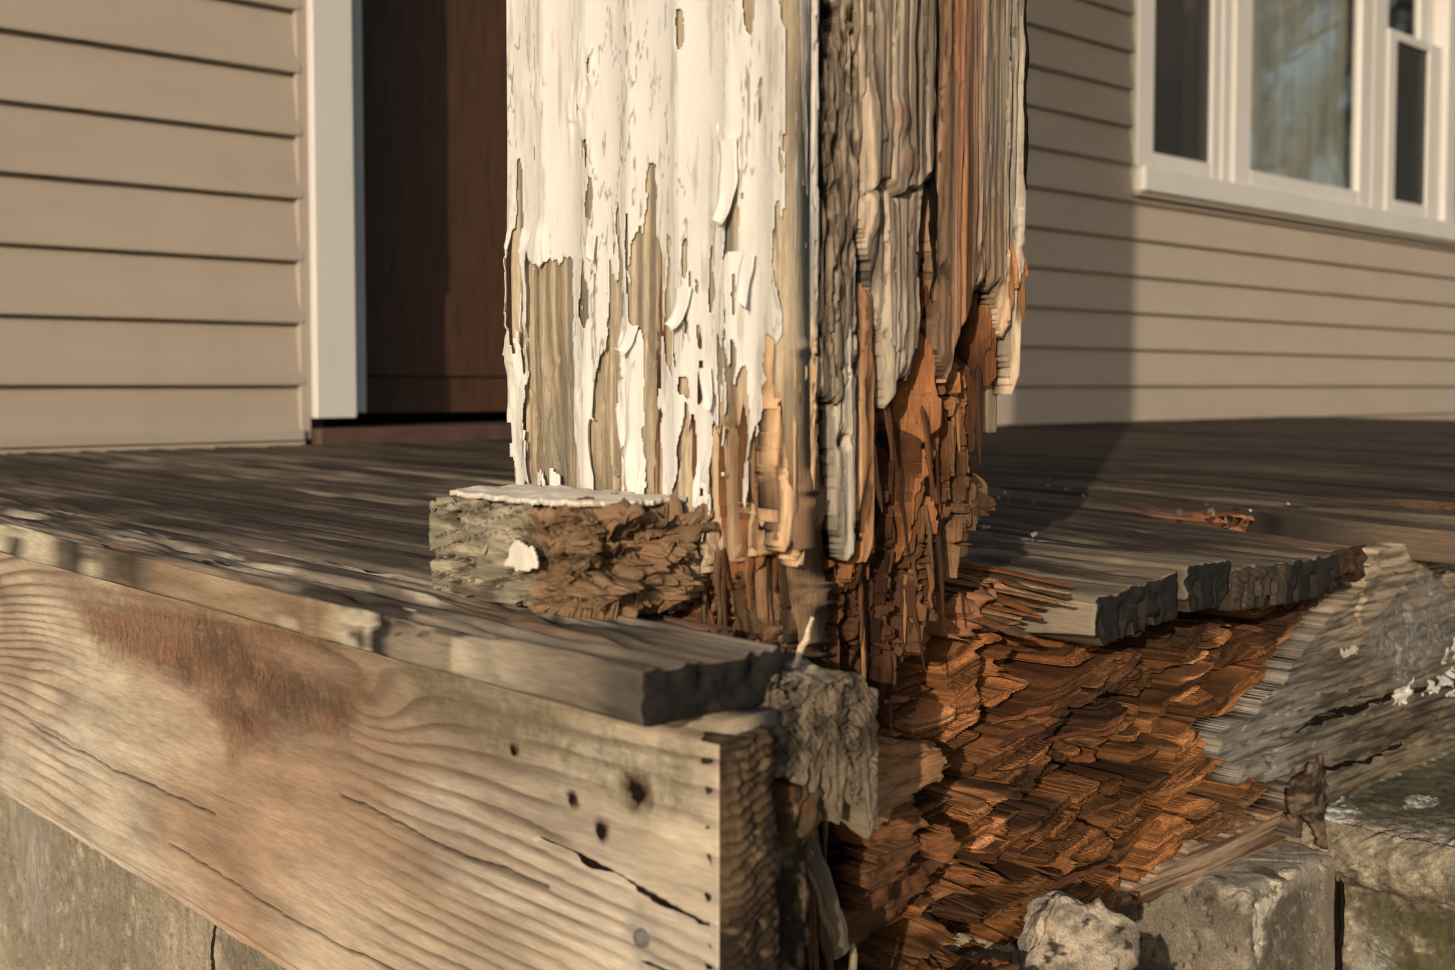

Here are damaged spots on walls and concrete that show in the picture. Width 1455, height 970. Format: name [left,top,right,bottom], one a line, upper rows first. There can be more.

peeling [449,0,786,542]
peeling [504,540,540,572]
peeling [1340,576,1455,706]
crack [209,925,217,970]